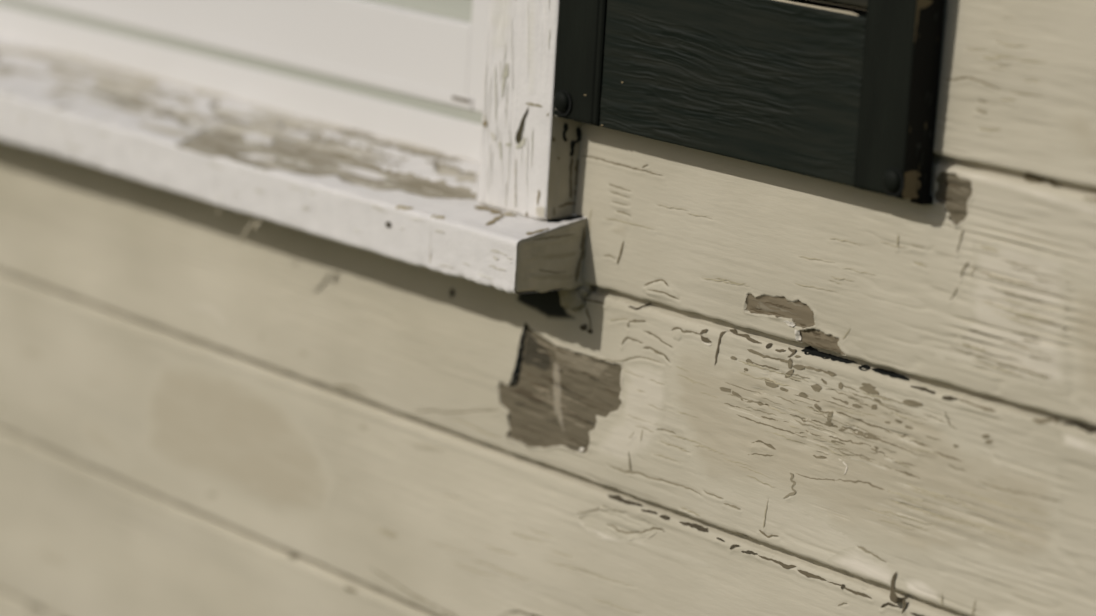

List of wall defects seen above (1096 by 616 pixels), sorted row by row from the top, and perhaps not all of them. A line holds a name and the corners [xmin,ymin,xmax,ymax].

peeling [90,85,480,199]
peeling [534,203,546,219]
peeling [935,172,972,225]
peeling [745,294,845,355]
peeling [498,324,622,453]